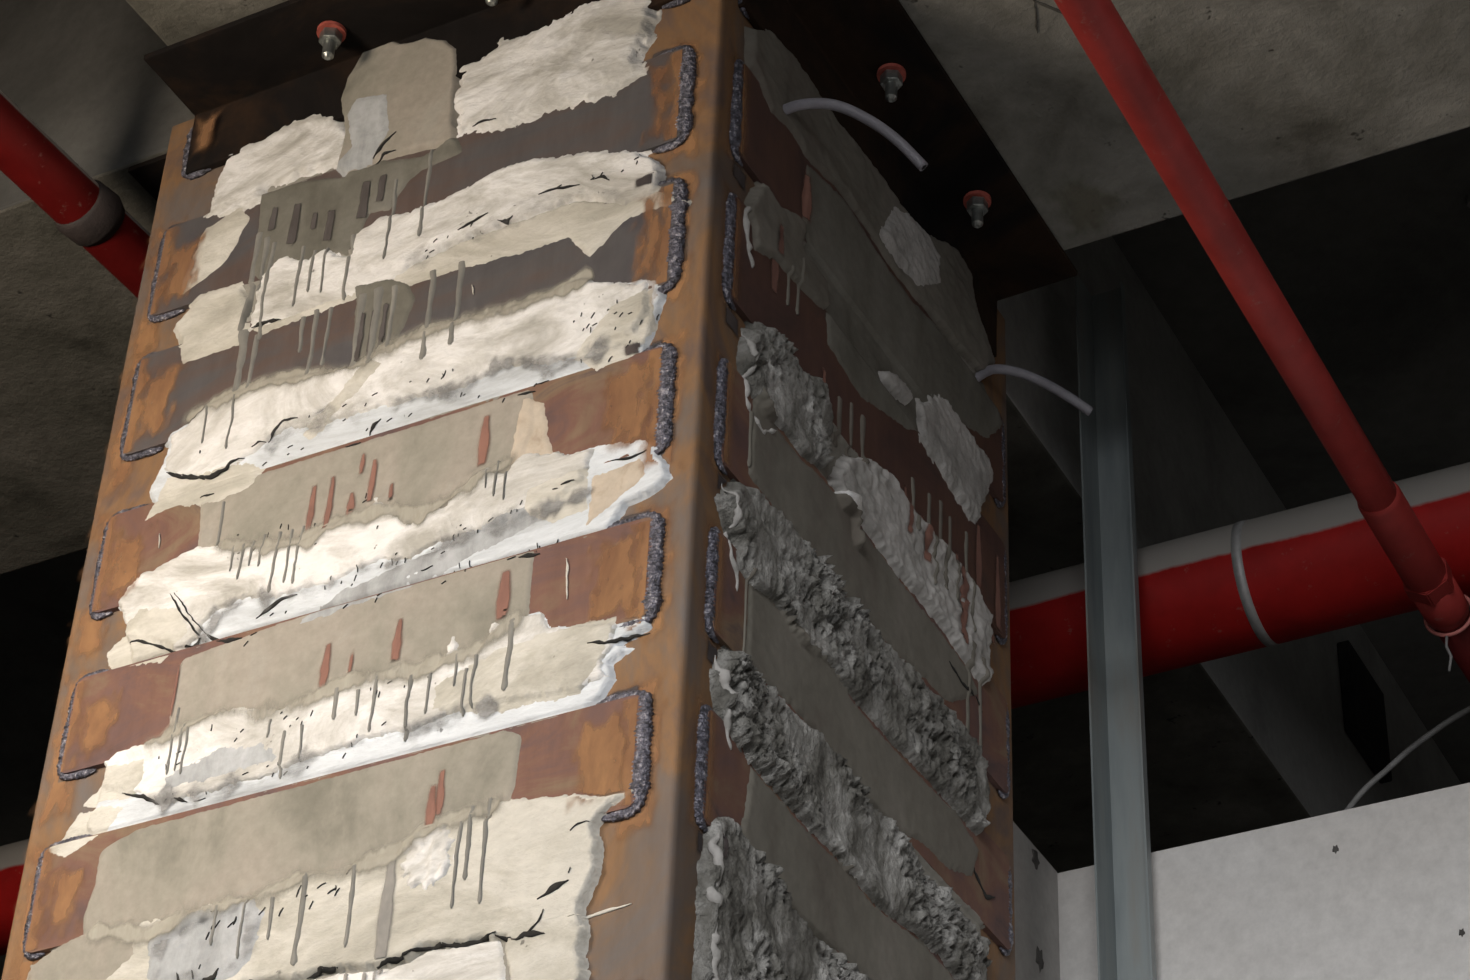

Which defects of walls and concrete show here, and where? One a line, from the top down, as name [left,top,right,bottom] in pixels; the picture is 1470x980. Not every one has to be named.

corrosion [110,229,205,488]
damp [225,38,462,449]
peeling [146,114,692,520]
damp [83,551,535,980]
corrosion [305,454,393,531]
peeling [50,610,652,858]
crack [130,479,574,653]
damp [198,390,553,593]
corrosion [576,679,661,837]
crack [587,633,651,644]
peeling [26,789,633,980]
crack [376,867,571,969]